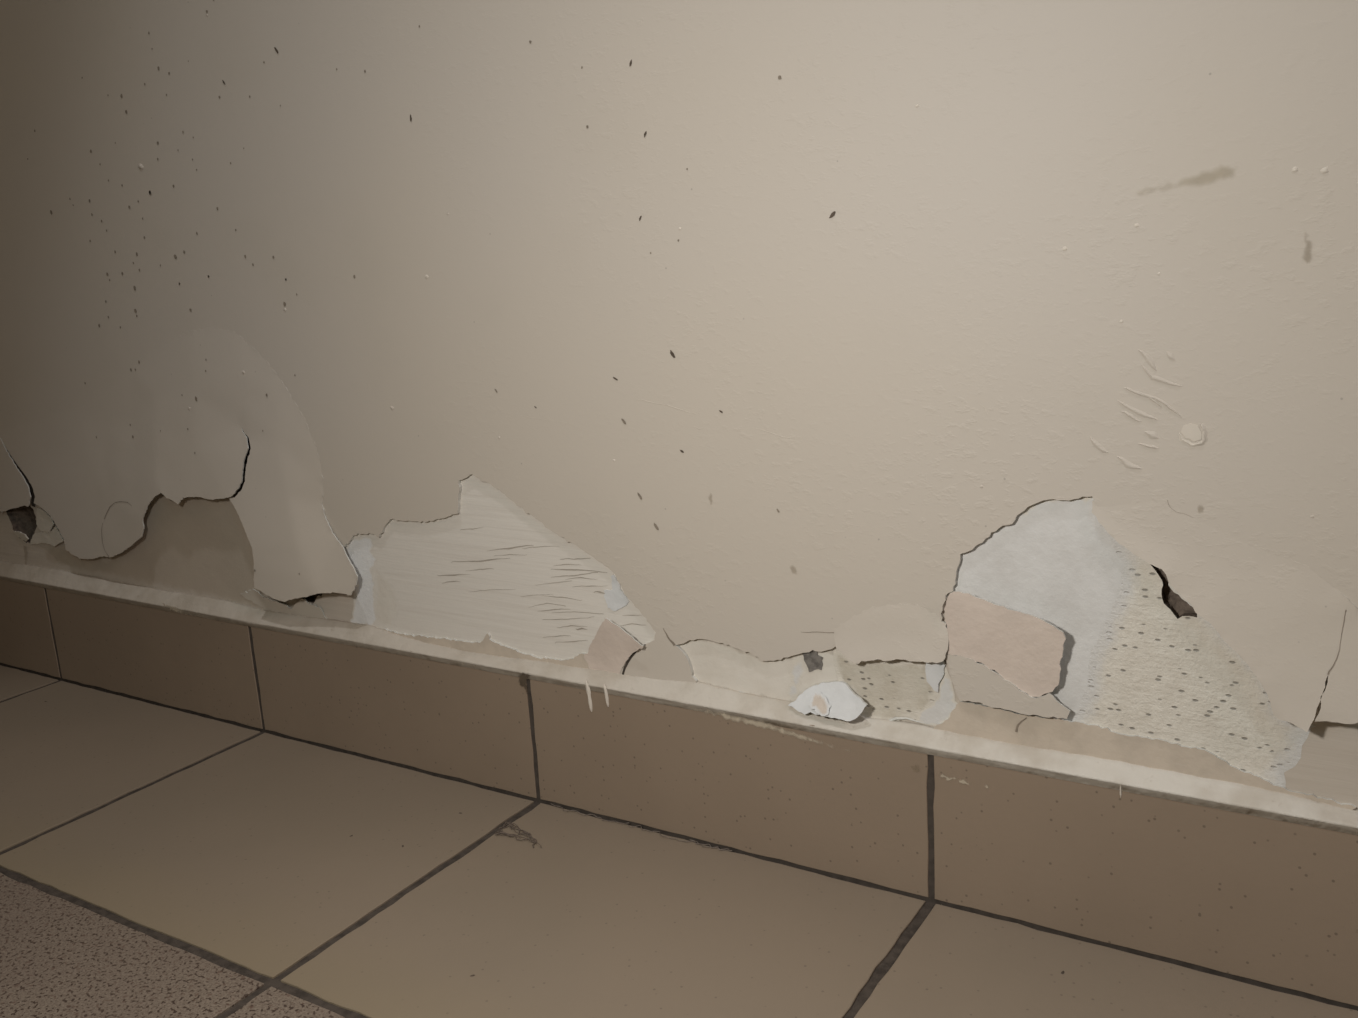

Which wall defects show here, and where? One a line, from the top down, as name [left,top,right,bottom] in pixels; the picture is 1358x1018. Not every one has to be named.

peeling [0,327,656,674]
peeling [679,496,1358,810]